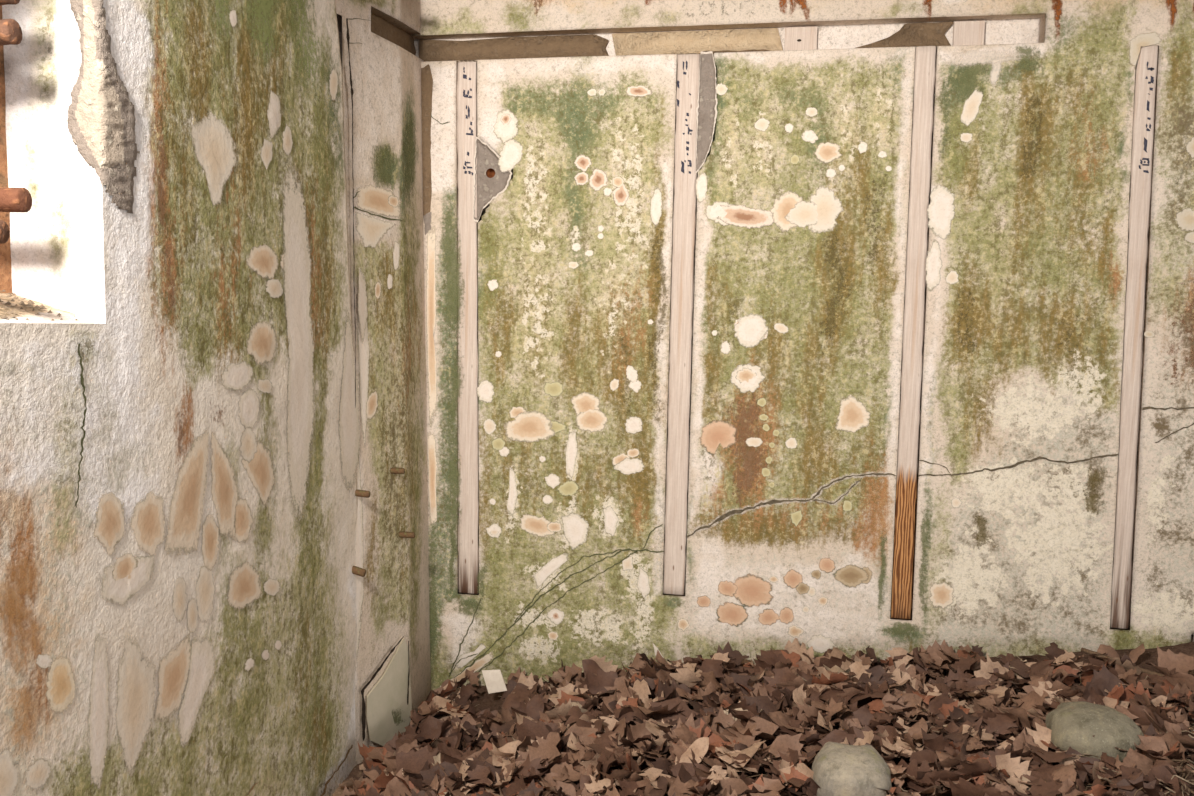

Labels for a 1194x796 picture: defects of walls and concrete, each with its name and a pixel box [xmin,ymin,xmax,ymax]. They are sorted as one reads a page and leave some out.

rust [779,0,809,19]
rust [1052,0,1062,36]
rust [1166,0,1177,25]
spalling [67,0,140,213]
peeling [696,51,845,233]
leakage [938,47,1040,158]
peeling [88,91,315,789]
leakage [1070,469,1105,514]
crack [1142,406,1194,443]
crack [449,454,1118,679]
leakage [919,509,930,608]
crack [321,636,410,796]